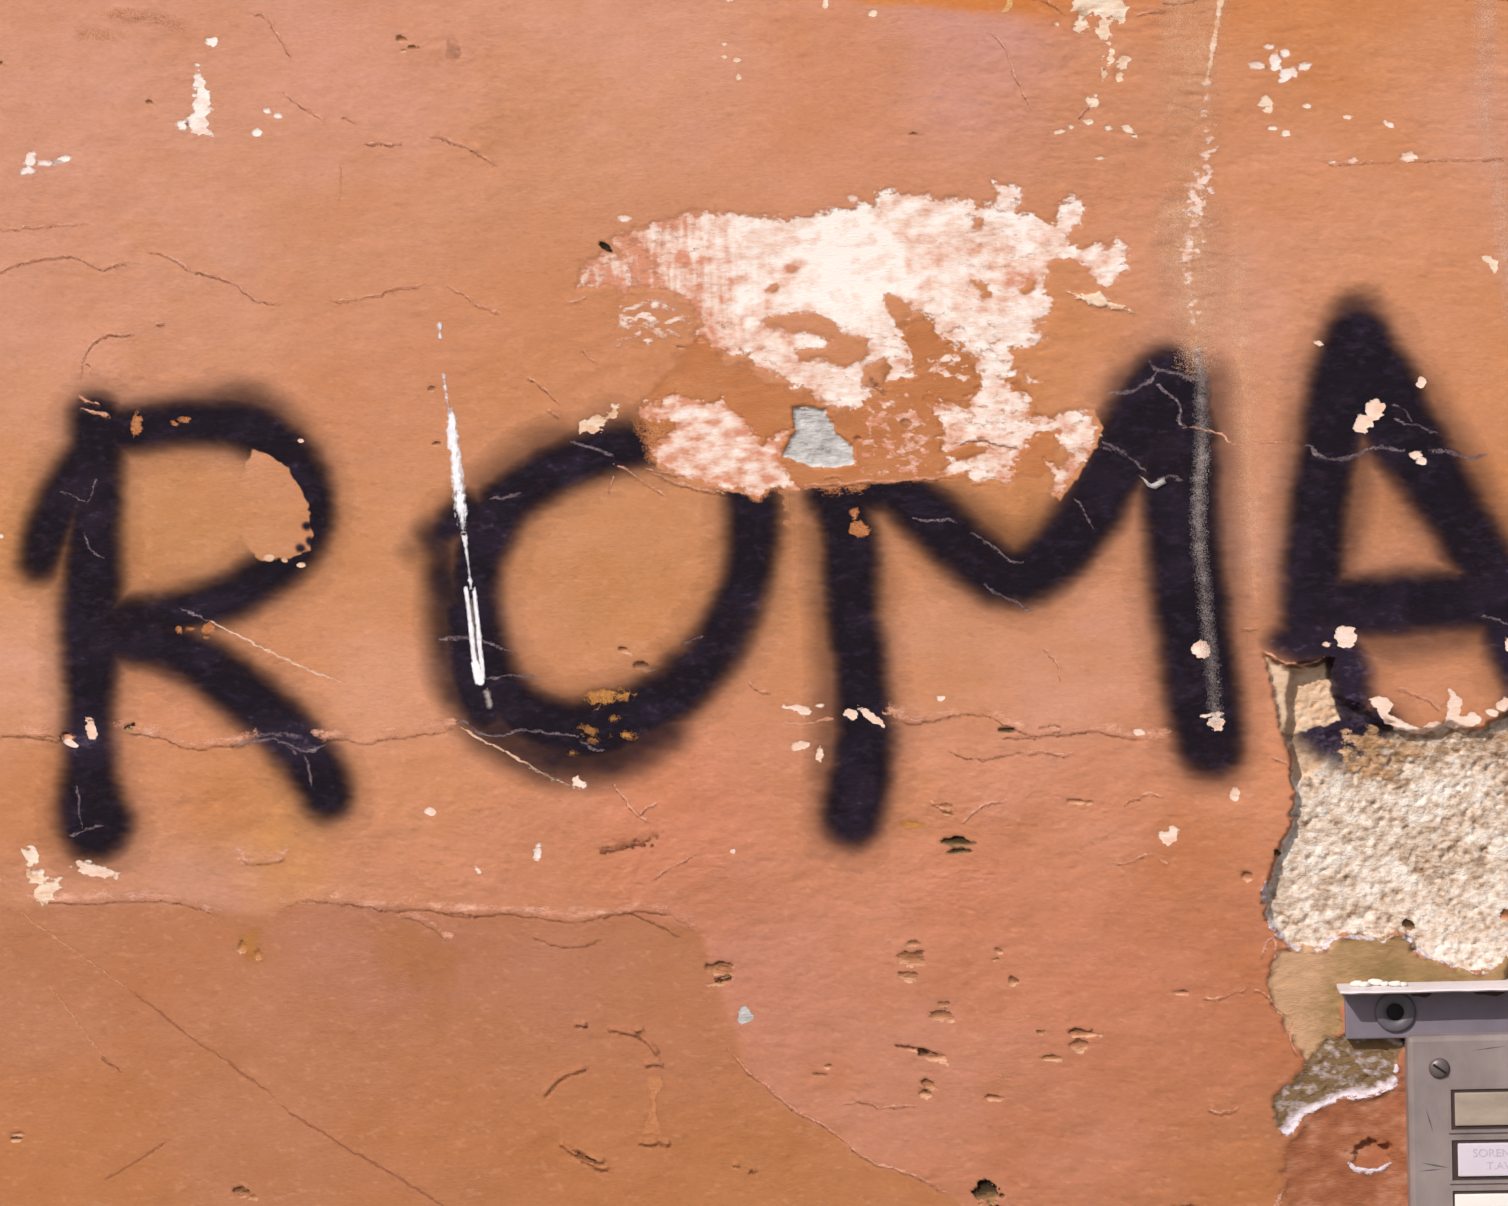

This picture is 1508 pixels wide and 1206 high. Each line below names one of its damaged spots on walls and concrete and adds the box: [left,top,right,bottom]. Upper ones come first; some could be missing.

peeling [175,63,214,137]
peeling [1248,44,1311,137]
crack [0,222,282,306]
peeling [575,177,1135,538]
peeling [235,450,314,568]
crack [441,635,538,680]
crack [230,732,322,785]
crack [457,720,657,823]
crack [749,681,834,726]
crack [882,712,925,722]
crack [930,799,1006,824]
spalling [1260,626,1508,1206]